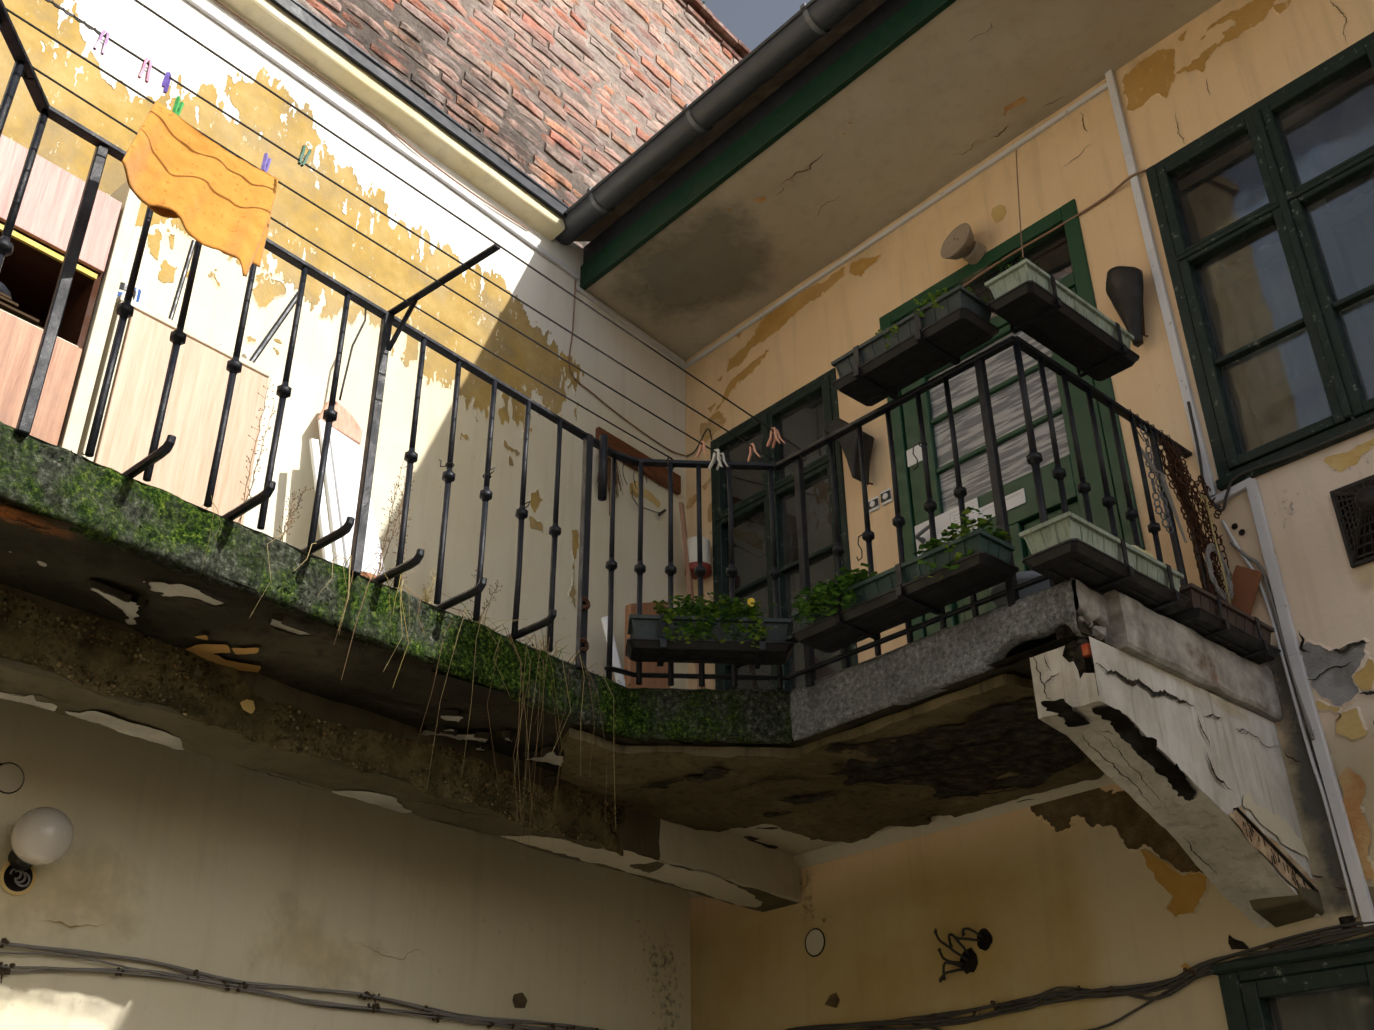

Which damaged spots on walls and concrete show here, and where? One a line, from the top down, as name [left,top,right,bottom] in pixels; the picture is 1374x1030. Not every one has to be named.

peeling [1101,0,1293,113]
peeling [0,0,584,468]
leakage [628,210,763,308]
peeling [527,488,544,533]
peeling [1324,436,1374,472]
spalling [0,577,626,856]
spalling [824,613,1210,920]
crack [1032,655,1056,700]
crack [1082,731,1217,875]
crack [1096,663,1302,791]
flaking render [1299,637,1374,742]
peeling [1339,767,1374,907]